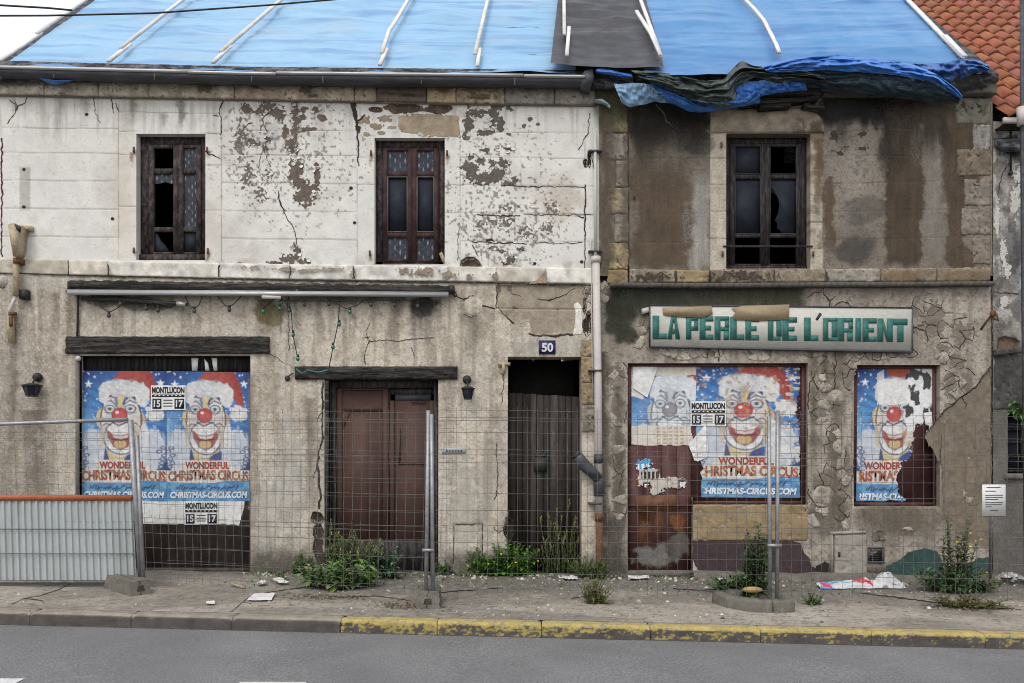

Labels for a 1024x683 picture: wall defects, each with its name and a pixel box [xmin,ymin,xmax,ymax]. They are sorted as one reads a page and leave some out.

peeling [232,86,327,209]
crack [0,97,594,364]
peeling [357,88,518,187]
damp [596,91,710,269]
damp [815,97,985,281]
peeling [994,163,1020,281]
crack [313,382,324,509]
peeling [606,362,629,520]
crack [807,352,837,410]
flaking render [911,297,992,575]
crack [928,288,1019,485]